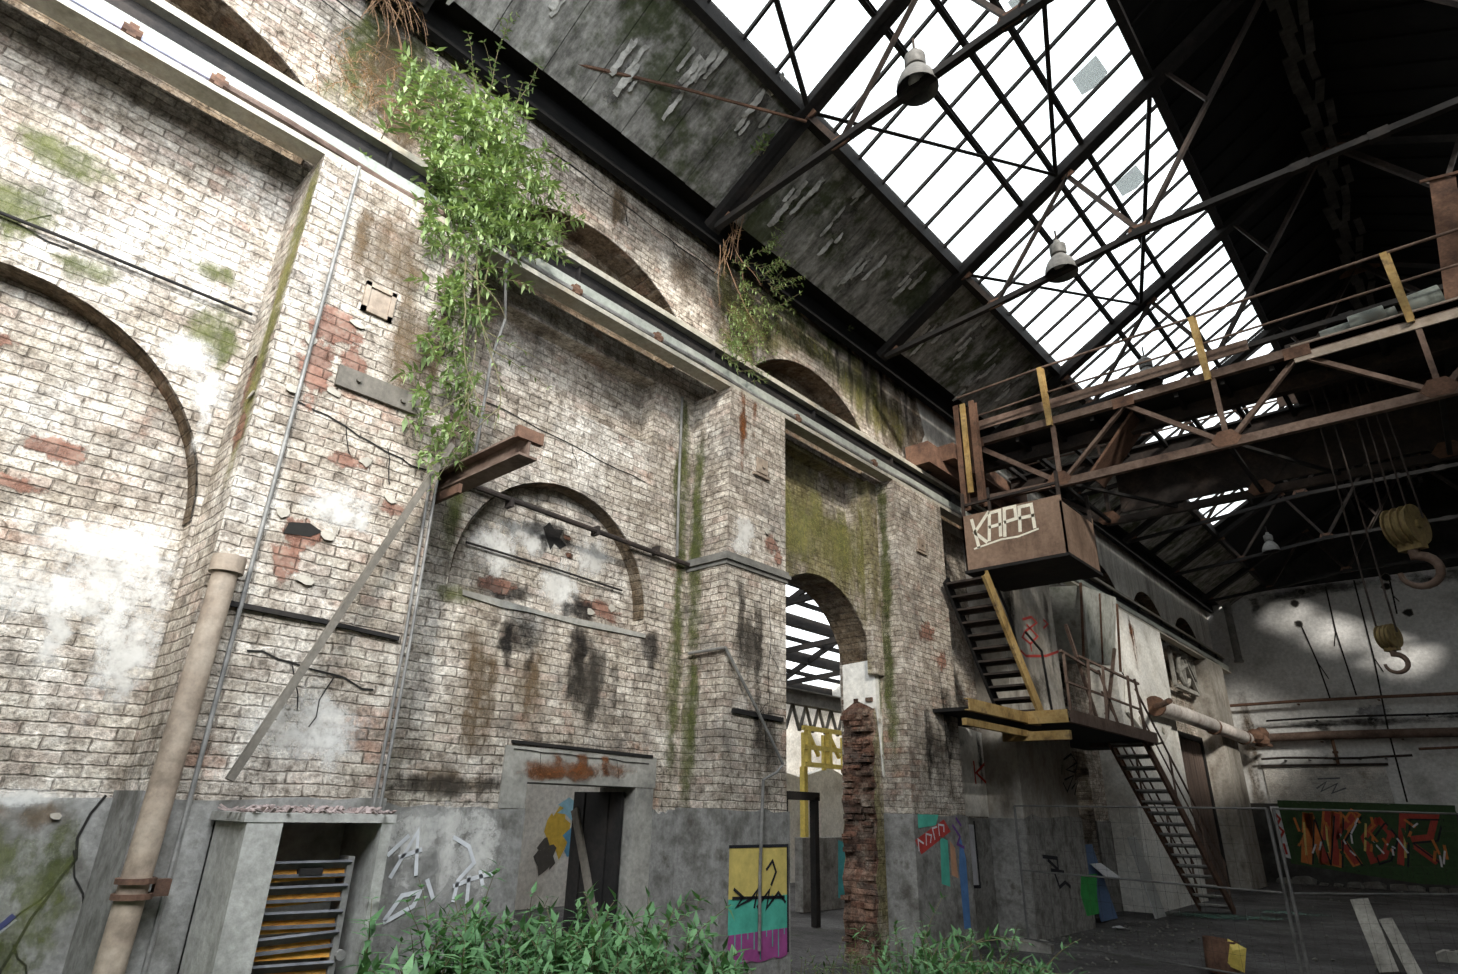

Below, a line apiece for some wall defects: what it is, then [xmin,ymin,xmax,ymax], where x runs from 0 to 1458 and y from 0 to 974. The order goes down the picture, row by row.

spalling [286,304,367,410]
spalling [270,508,336,585]
damp [0,523,163,698]
damp [566,641,618,721]